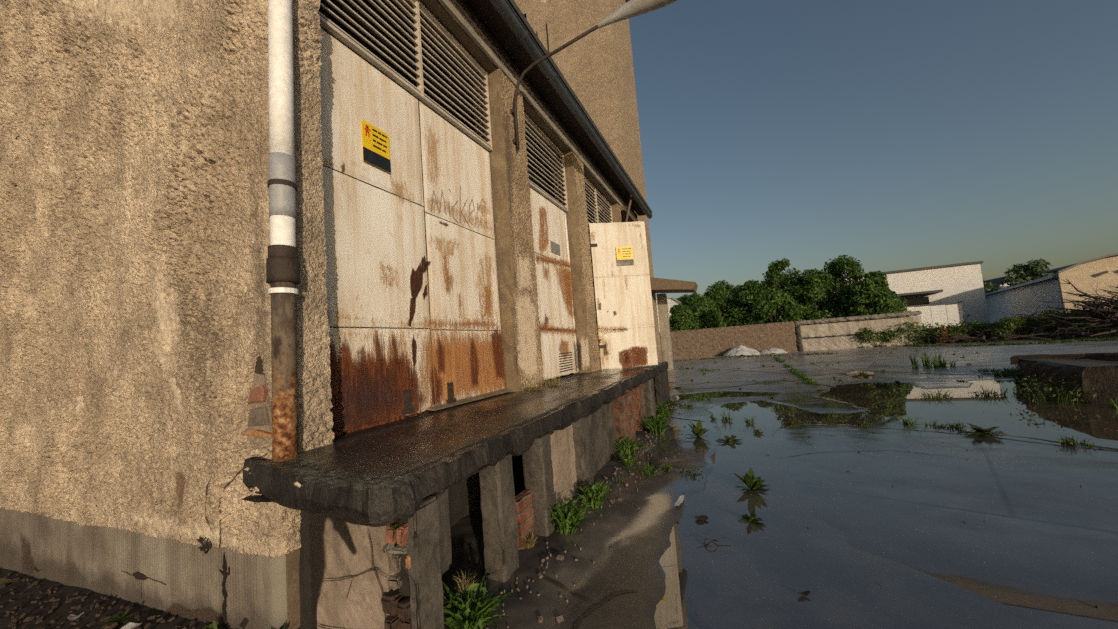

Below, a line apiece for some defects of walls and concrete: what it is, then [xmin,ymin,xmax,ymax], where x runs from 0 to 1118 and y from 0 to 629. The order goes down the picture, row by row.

rust [428,197,488,231]
rust [328,237,505,437]
rust [536,208,576,358]
rust [597,264,648,368]
spalling [241,356,272,448]